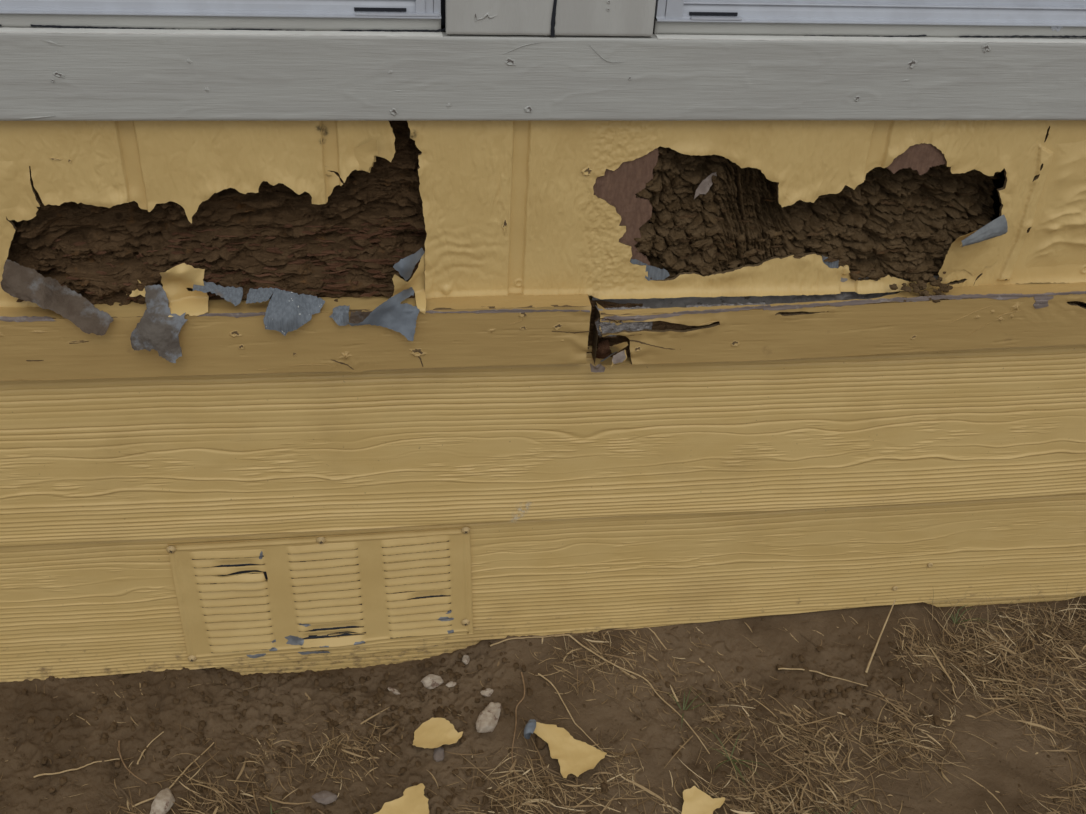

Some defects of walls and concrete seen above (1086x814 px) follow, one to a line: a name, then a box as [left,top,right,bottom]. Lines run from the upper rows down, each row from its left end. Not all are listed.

peeling [886,143,946,175]
peeling [581,148,659,266]
spalling [990,169,1005,220]
peeling [425,277,1086,330]